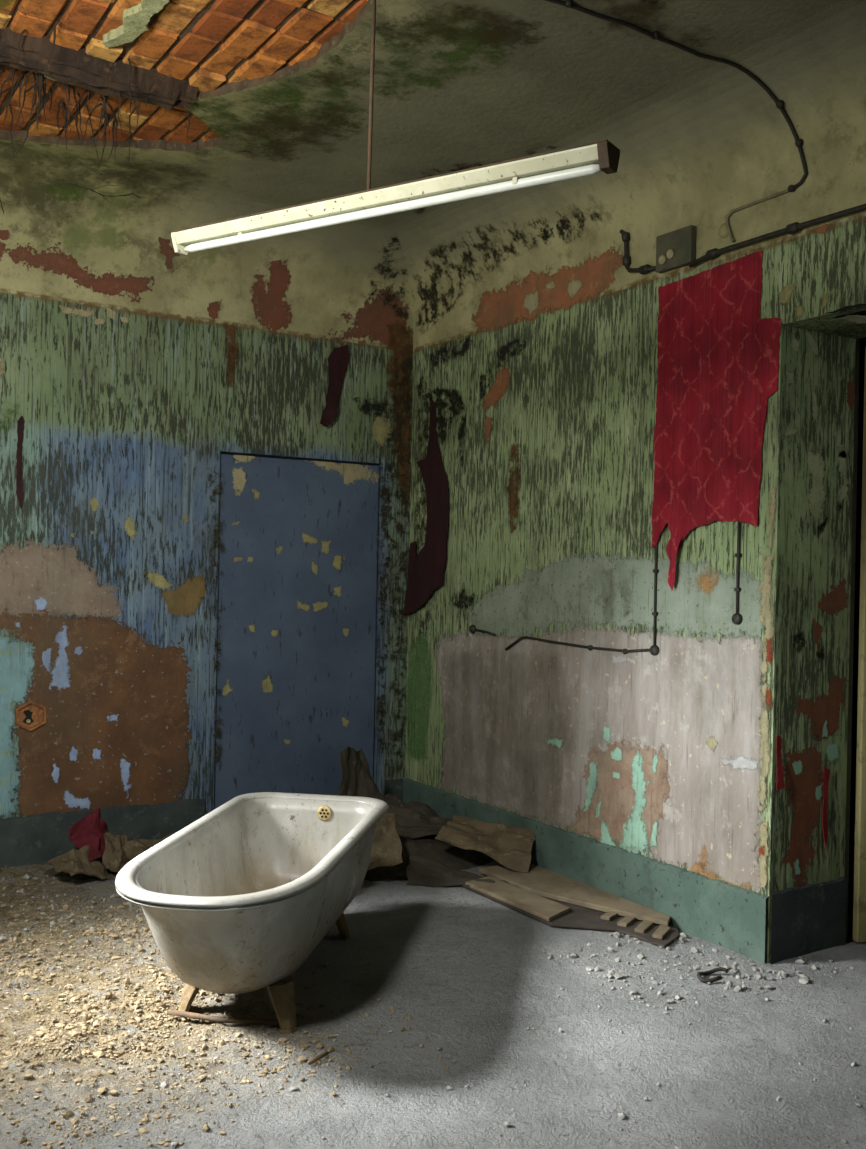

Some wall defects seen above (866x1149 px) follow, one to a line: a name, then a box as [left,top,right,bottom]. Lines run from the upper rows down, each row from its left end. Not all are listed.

flaking render [0,0,368,93]
flaking render [0,64,221,143]
flaking render [0,230,155,325]
flaking render [158,237,181,273]
flaking render [207,301,221,321]
flaking render [817,304,866,324]
peeling [123,517,137,541]
water stain [354,209,599,775]
peeling [0,533,194,819]
flaking render [433,487,849,893]